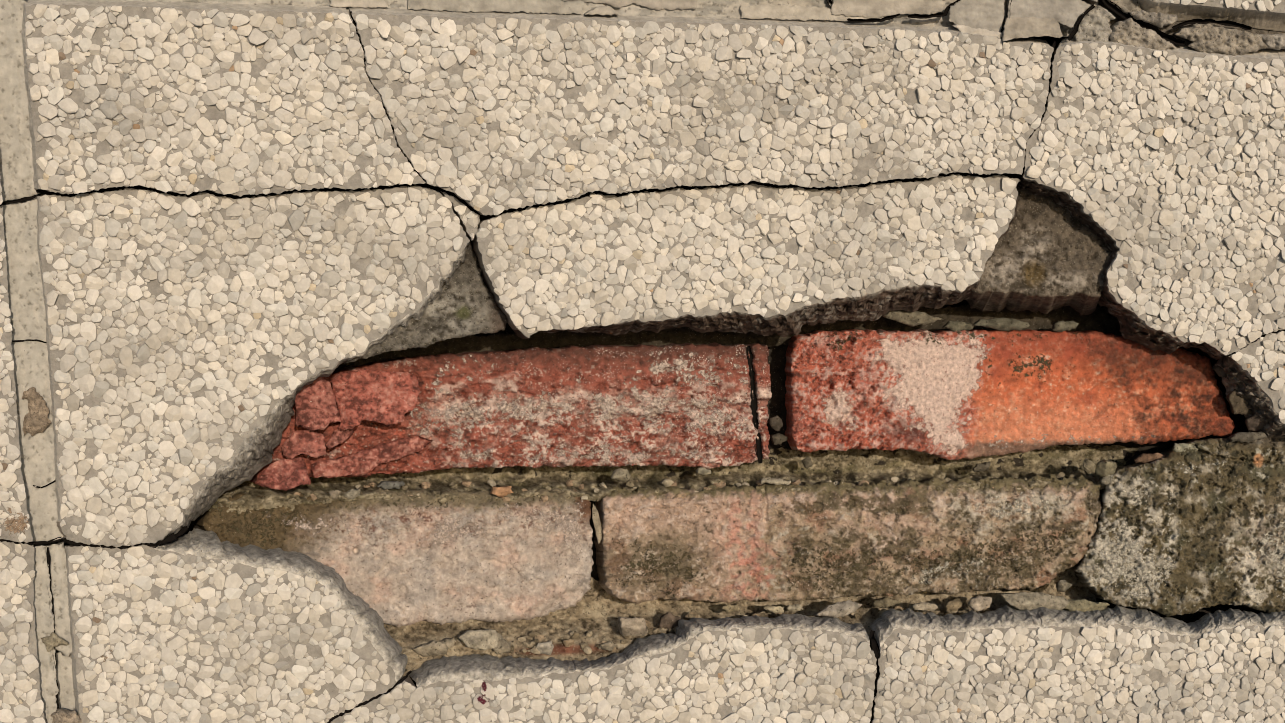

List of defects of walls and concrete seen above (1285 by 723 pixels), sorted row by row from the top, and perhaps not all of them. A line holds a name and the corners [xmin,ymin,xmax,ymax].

crack [0,0,1252,330]
spalling [512,178,1285,439]
spalling [154,242,1285,688]
crack [0,522,188,711]
crack [327,670,416,723]
crack [870,630,881,723]